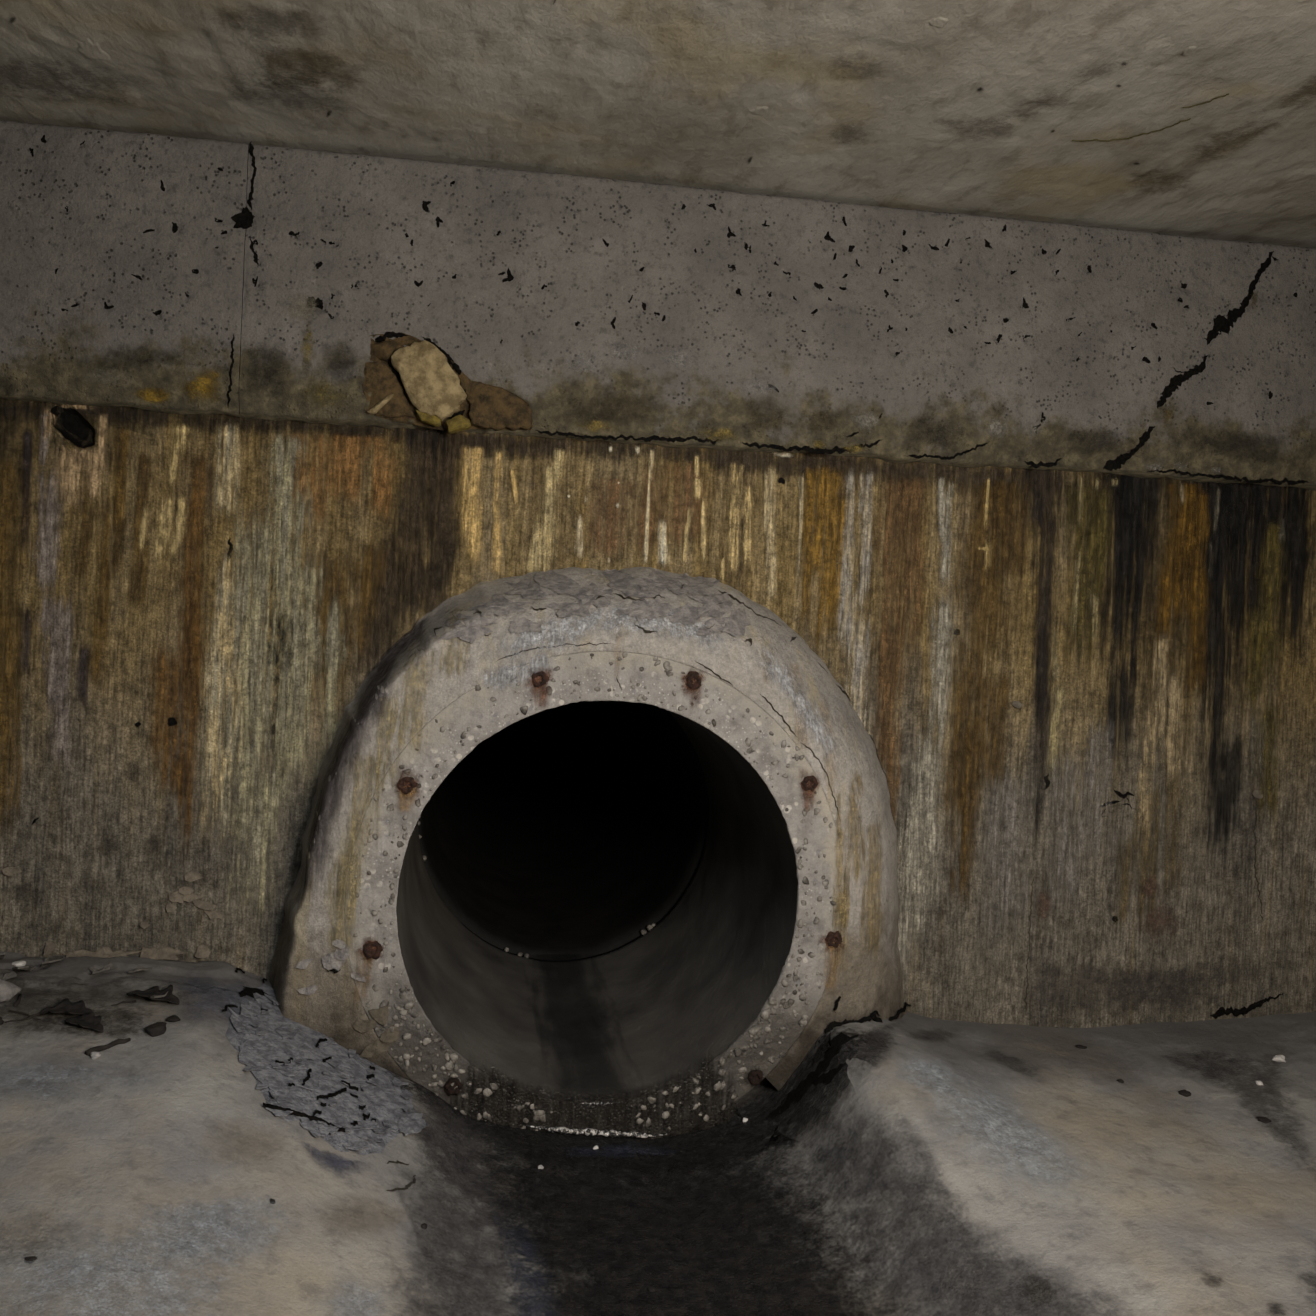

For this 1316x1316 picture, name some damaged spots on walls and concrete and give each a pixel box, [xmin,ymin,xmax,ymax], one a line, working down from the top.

spalling [363,331,534,434]
crack [535,430,880,454]
crack [1103,251,1309,485]
spalling [475,652,721,727]
damp [0,400,1307,960]
crack [697,662,841,822]
spalling [225,719,553,1155]
spalling [636,791,841,1130]
damp [394,1026,1090,1316]
crack [765,996,911,1120]
corrosion [822,777,879,974]
damp [1168,1051,1306,1150]